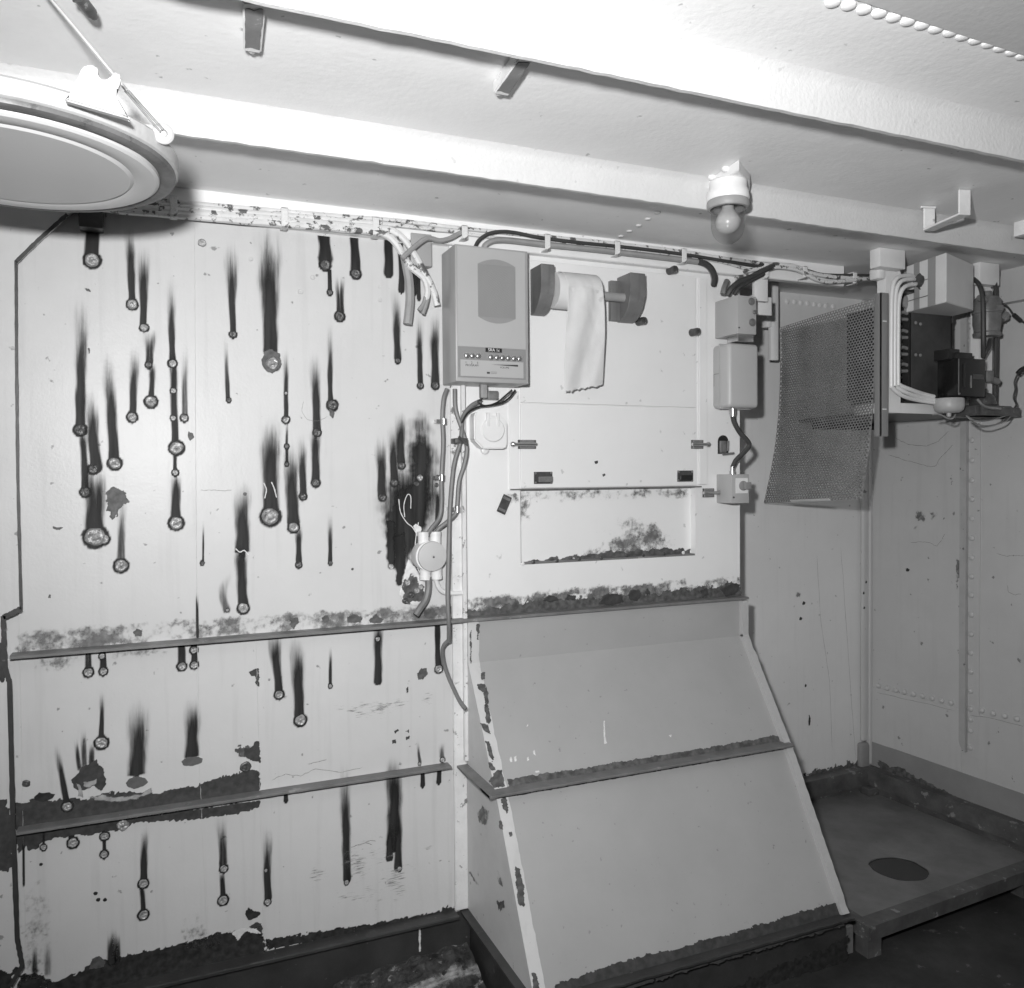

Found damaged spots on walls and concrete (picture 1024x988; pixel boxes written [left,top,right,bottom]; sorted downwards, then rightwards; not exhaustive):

corrosion [106,487,130,520]
peeling [71,742,152,802]
peeling [477,672,781,837]
corrosion [804,760,857,776]
corrosion [878,760,956,797]
peeling [515,867,525,907]
peeling [232,908,263,940]
peeling [555,903,850,988]